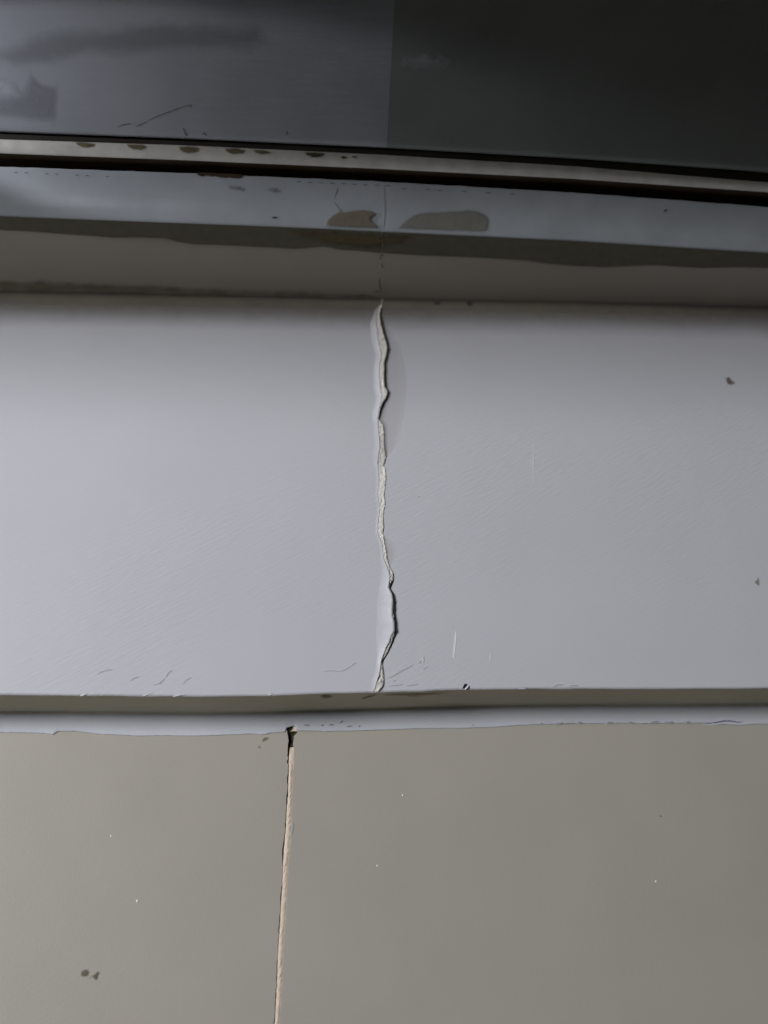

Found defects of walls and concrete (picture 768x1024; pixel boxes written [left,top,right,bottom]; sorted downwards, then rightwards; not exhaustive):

peeling [327,210,376,227]
peeling [399,211,488,231]
crack [326,254,442,700]
crack [274,720,361,1024]